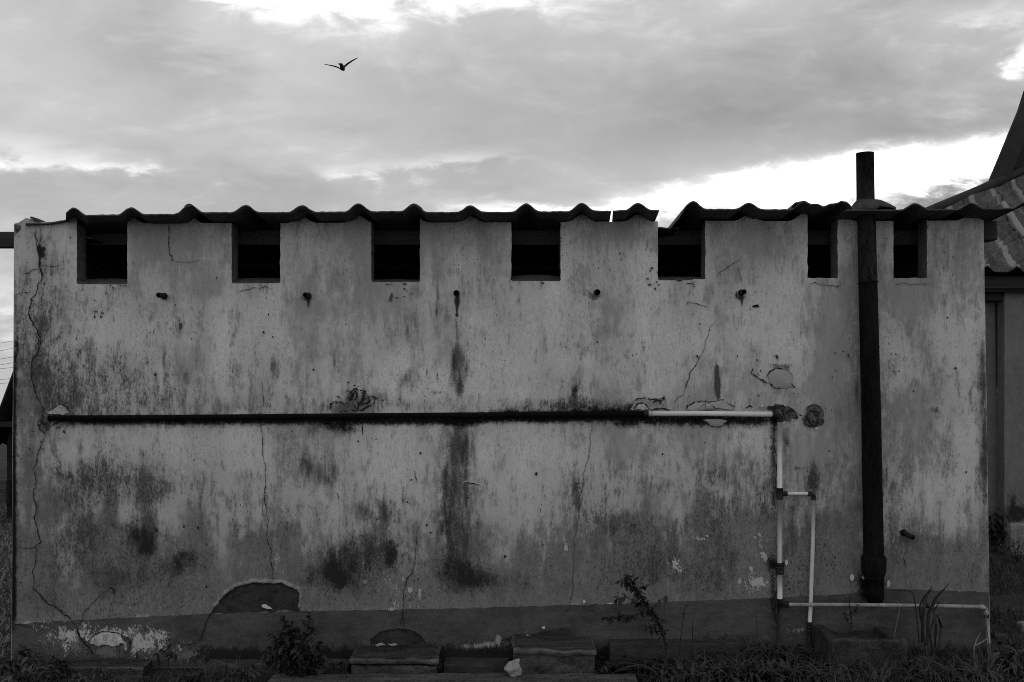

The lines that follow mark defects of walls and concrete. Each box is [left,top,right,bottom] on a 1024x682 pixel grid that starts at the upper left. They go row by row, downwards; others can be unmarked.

crack [17,232,60,406]
spalling [329,381,384,413]
leakage [452,344,467,394]
crack [674,259,742,403]
crack [20,432,104,654]
peeling [33,622,201,665]
peeling [211,578,304,614]
crack [261,388,274,580]
leakage [53,386,789,588]